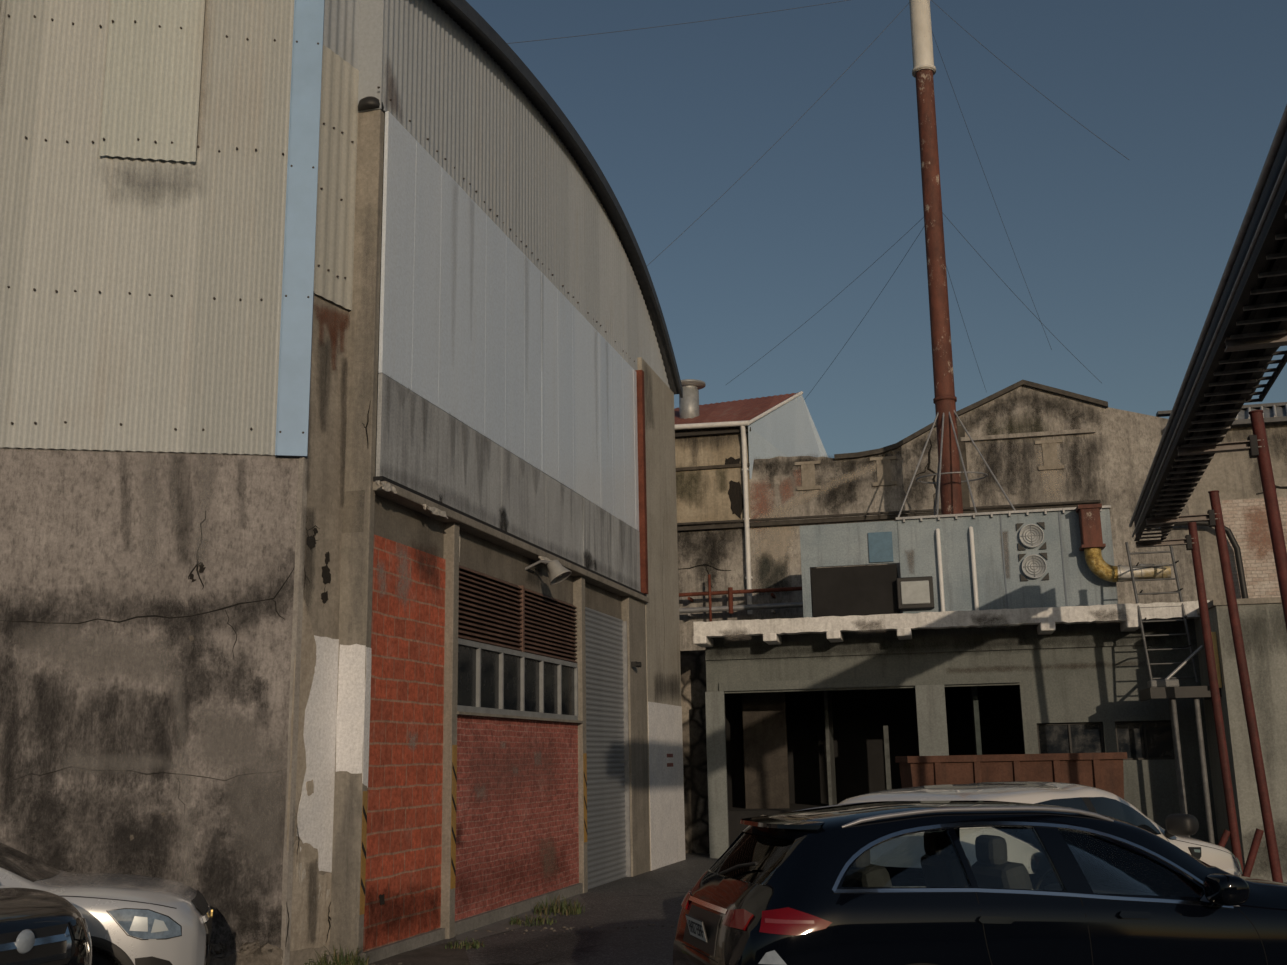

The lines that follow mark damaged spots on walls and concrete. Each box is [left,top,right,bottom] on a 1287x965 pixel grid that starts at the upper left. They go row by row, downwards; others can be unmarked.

corrosion [317,308,349,368]
damp [753,436,937,506]
damp [957,393,1101,500]
crack [0,511,325,658]
damp [677,523,742,582]
damp [758,556,787,595]
damp [0,513,313,877]
peeling [210,528,332,965]
damp [187,779,285,954]